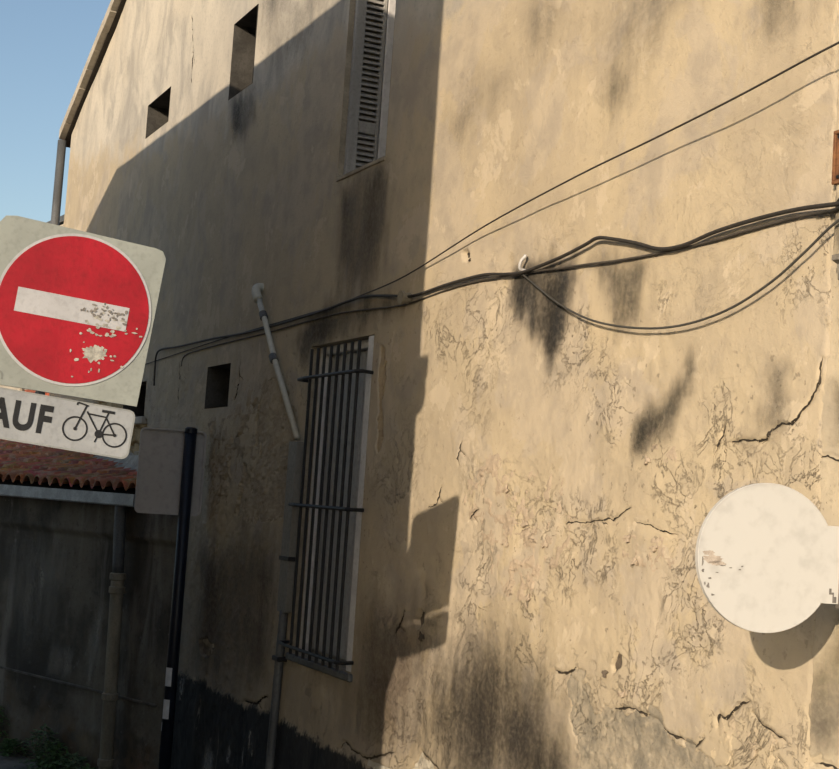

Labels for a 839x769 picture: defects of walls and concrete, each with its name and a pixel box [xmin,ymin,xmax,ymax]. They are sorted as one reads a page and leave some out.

water stain [513,263,571,358]
flaking render [130,422,148,454]
flaking render [238,378,298,524]
water stain [636,388,680,448]
crack [716,357,823,451]
crack [567,508,674,534]
flaking render [413,752,434,769]
crack [616,706,704,747]
flaking render [567,668,781,769]
crack [717,701,786,766]